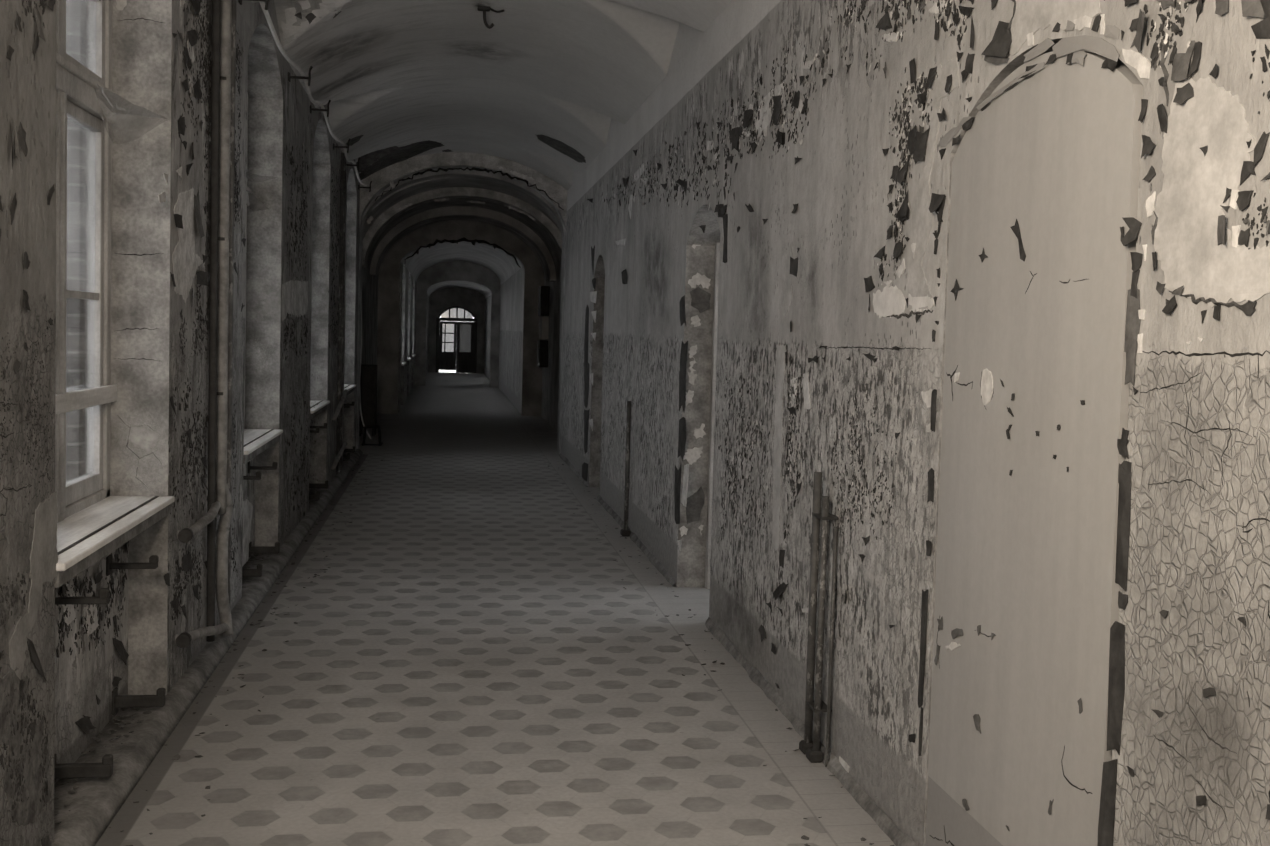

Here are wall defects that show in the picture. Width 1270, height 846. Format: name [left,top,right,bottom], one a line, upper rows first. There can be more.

peeling [116,0,214,365]
spalling [536,134,586,163]
spalling [0,491,129,826]
peeling [117,378,208,520]
peeling [164,543,207,625]
spalling [582,245,597,481]
flaking render [587,0,1270,616]
spalling [908,589,996,756]
crack [1140,295,1270,496]
crack [1242,518,1270,533]
spalling [1196,781,1227,821]
crack [1262,790,1270,819]